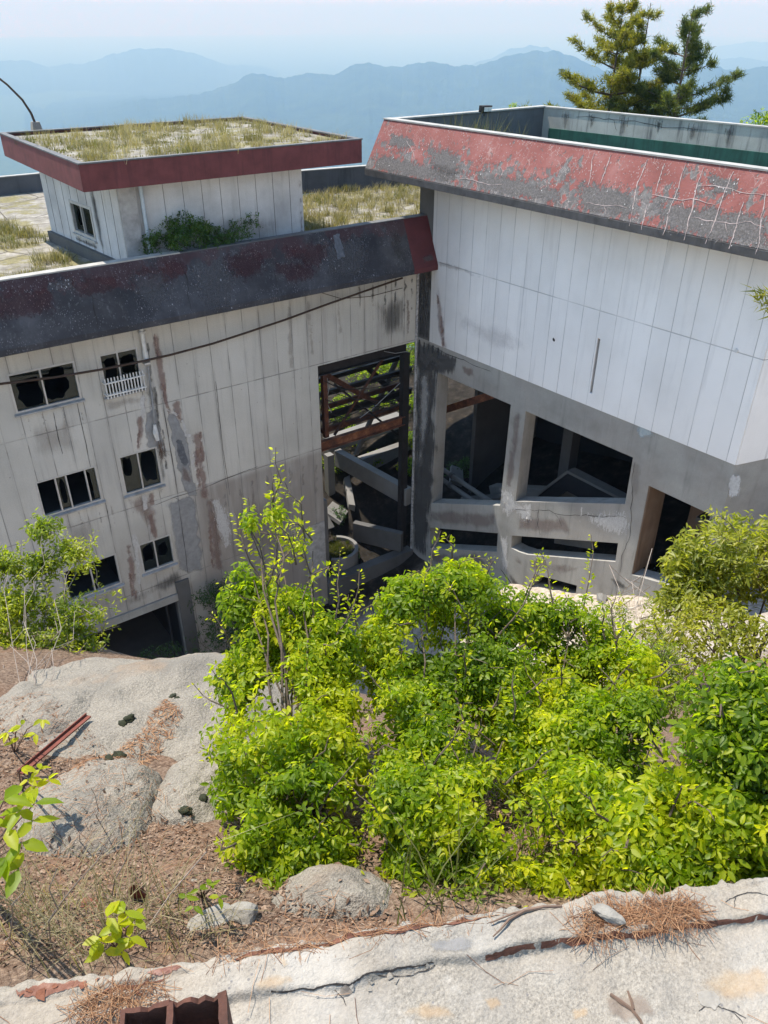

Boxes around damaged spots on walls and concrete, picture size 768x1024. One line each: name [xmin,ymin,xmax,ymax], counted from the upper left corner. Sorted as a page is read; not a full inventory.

peeling [374,133,463,184]
peeling [576,178,634,222]
crack [586,153,768,254]
peeling [654,172,768,247]
corrosion [154,337,180,419]
water stain [359,271,456,555]
corrosion [194,432,206,497]
corrosion [149,494,157,537]
crack [516,464,635,571]
peeling [580,507,632,536]
corrosion [128,547,136,597]
crack [271,962,435,1005]